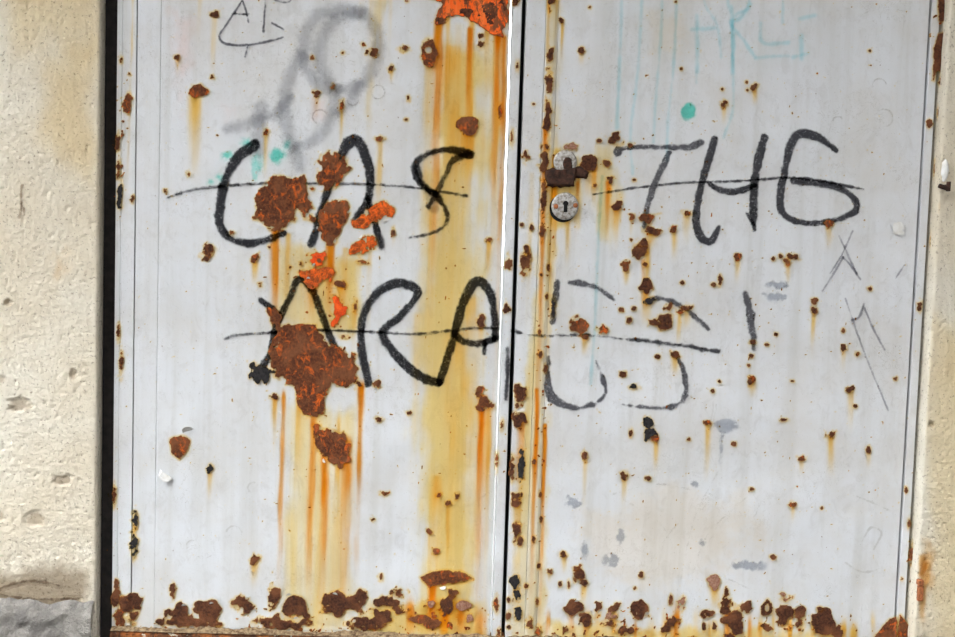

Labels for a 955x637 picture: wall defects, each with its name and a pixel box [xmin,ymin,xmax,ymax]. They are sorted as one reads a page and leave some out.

peeling [435,0,509,38]
rust [511,47,560,252]
rust [564,142,613,187]
rust [504,245,556,317]
rust [606,201,693,330]
rust [561,315,608,340]
rust [475,386,494,417]
rust [628,417,659,443]
rust [495,444,545,511]
rust [110,579,143,626]
rust [154,558,685,637]
rust [691,574,857,637]